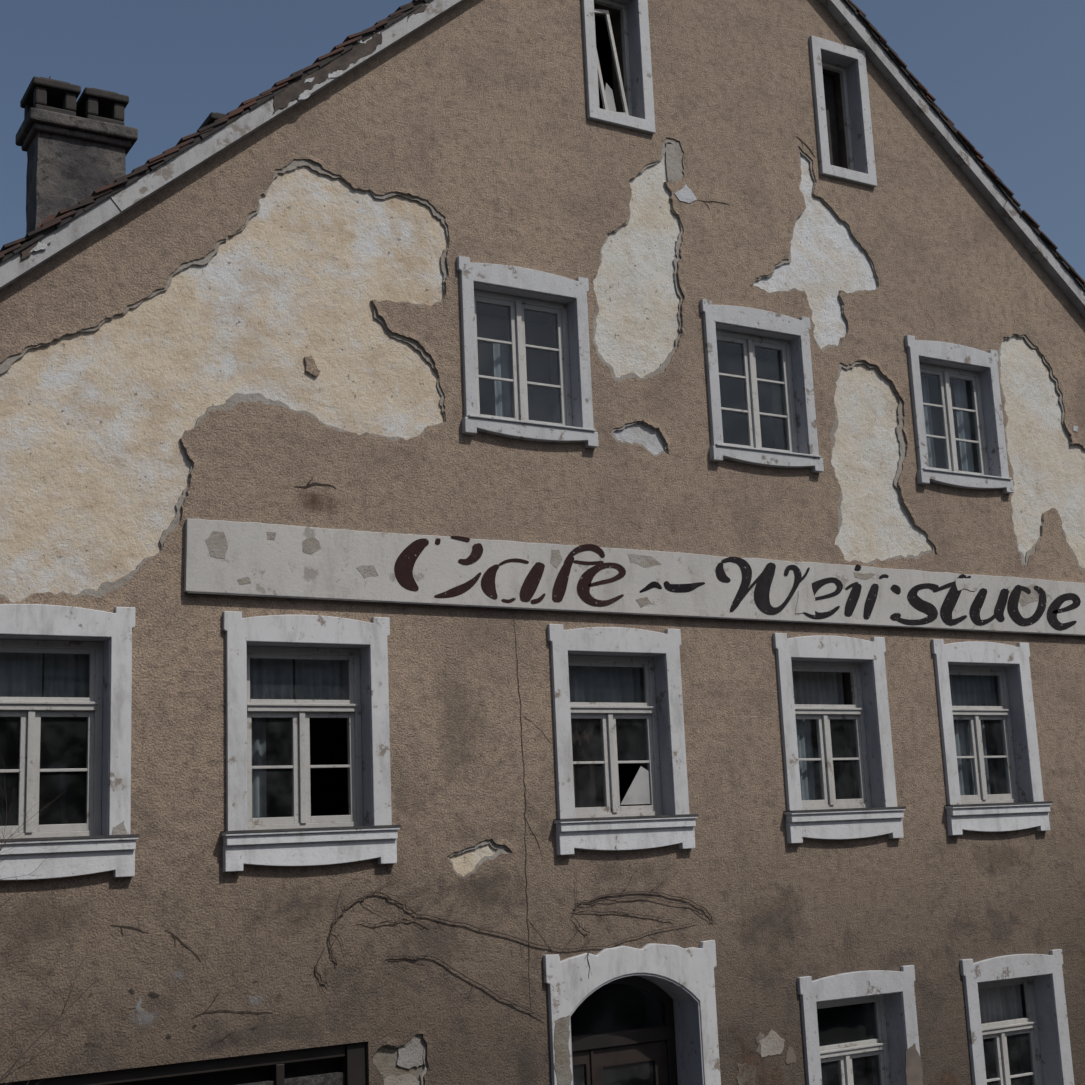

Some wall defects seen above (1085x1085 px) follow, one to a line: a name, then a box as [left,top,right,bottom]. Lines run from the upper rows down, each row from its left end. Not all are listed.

peeling [273,30,382,114]
flaking render [592,138,697,382]
flaking render [751,148,878,351]
flaking render [0,154,453,603]
flaking render [609,416,672,457]
flaking render [828,355,940,579]
flaking render [997,334,1085,573]
flaking render [447,832,517,879]
crack [514,626,552,1019]
flaking render [373,1028,434,1085]